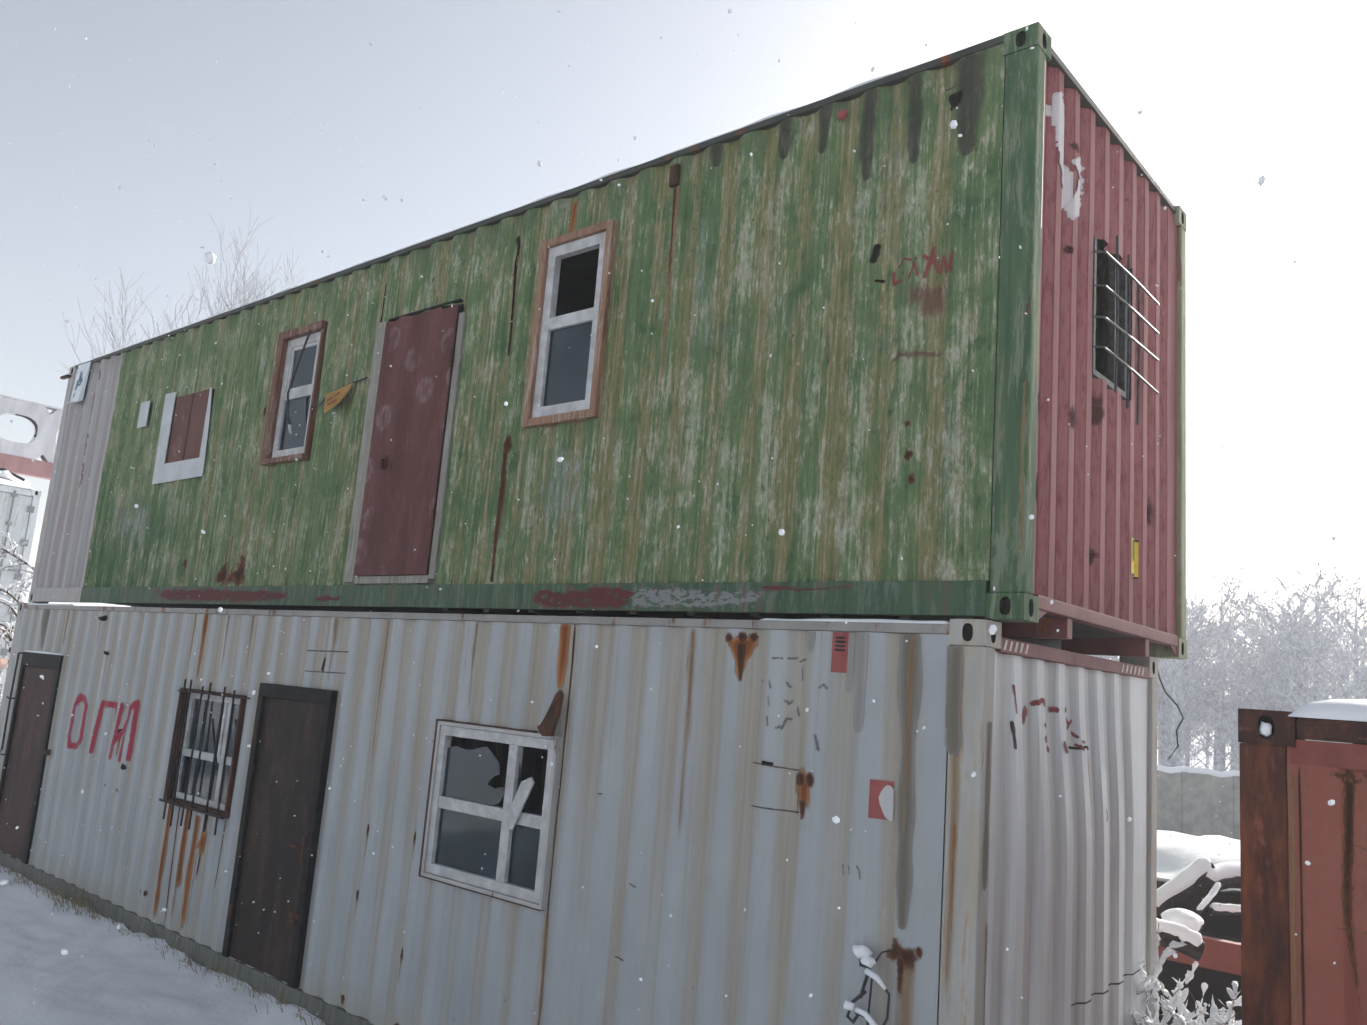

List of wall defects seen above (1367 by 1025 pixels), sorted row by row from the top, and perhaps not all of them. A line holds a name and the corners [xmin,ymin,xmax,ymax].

damp [818,104,832,154]
damp [860,88,877,181]
damp [907,73,923,163]
damp [957,53,984,156]
peeling [1046,92,1085,221]
peeling [530,584,854,610]
corrosion [725,632,758,680]
corrosion [795,767,813,819]
corrosion [140,804,226,927]
corrosion [945,752,959,978]
corrosion [1333,770,1367,987]
corrosion [886,938,922,1025]